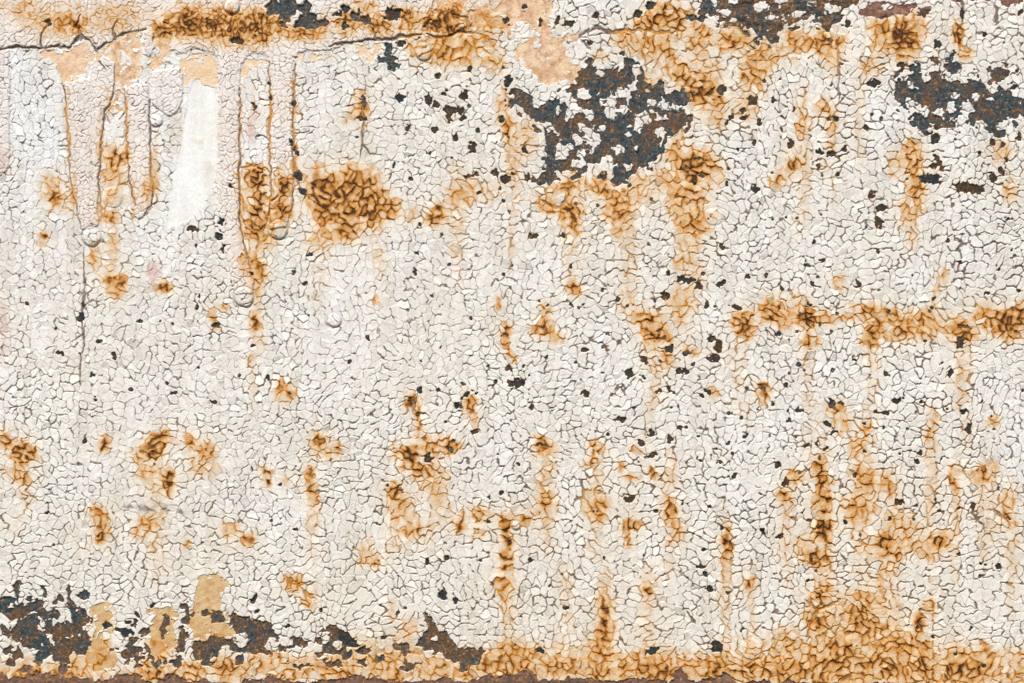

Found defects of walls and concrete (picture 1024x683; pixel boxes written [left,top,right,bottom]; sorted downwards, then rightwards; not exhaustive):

rust [152,0,507,72]
peeling [265,0,404,30]
crack [794,15,825,39]
crack [118,161,137,207]
crack [237,56,278,234]
rust [234,79,493,338]
peeling [421,0,693,188]
peeling [893,40,1024,195]
rust [729,268,1024,351]
rust [131,393,1024,683]
crack [0,622,49,676]
peeling [0,572,823,683]